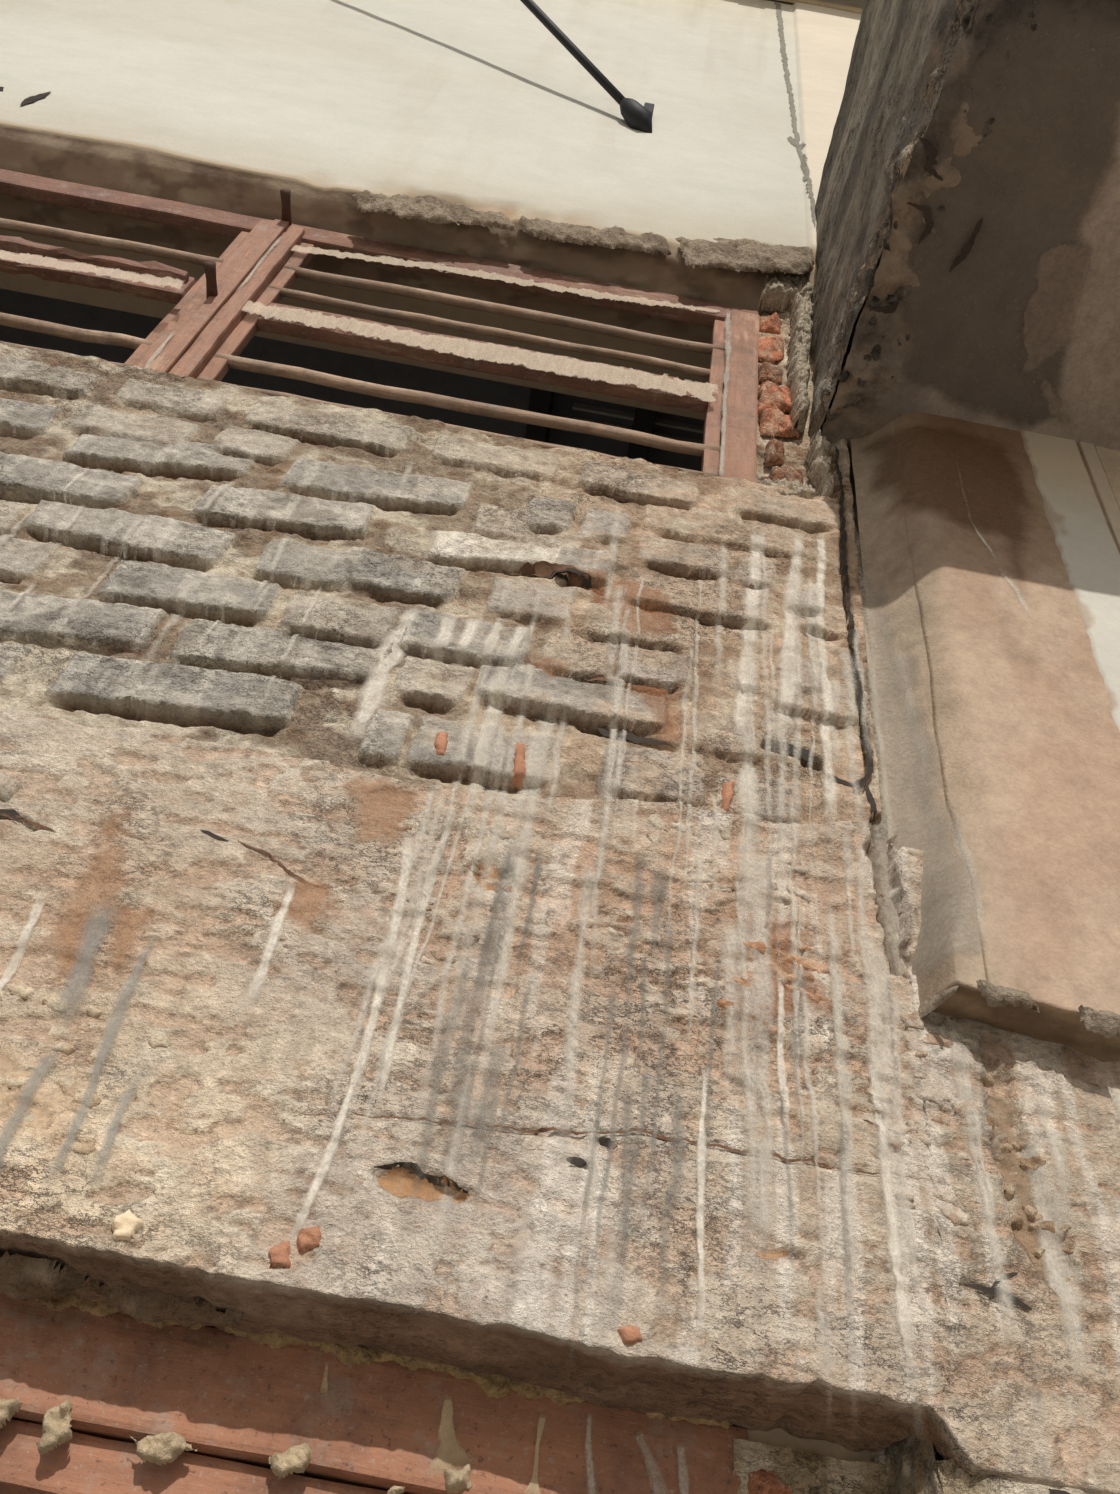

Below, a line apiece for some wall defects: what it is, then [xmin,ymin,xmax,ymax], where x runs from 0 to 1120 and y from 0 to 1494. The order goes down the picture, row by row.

spalling [826,221,910,421]
peeling [1023,245,1092,424]
leakage [870,426,1024,548]
leakage [586,525,643,886]
leakage [681,627,698,776]
crack [770,446,877,845]
crack [0,809,56,832]
leakage [710,536,981,1343]
spalling [374,1162,468,1201]
leakage [668,1078,710,1286]